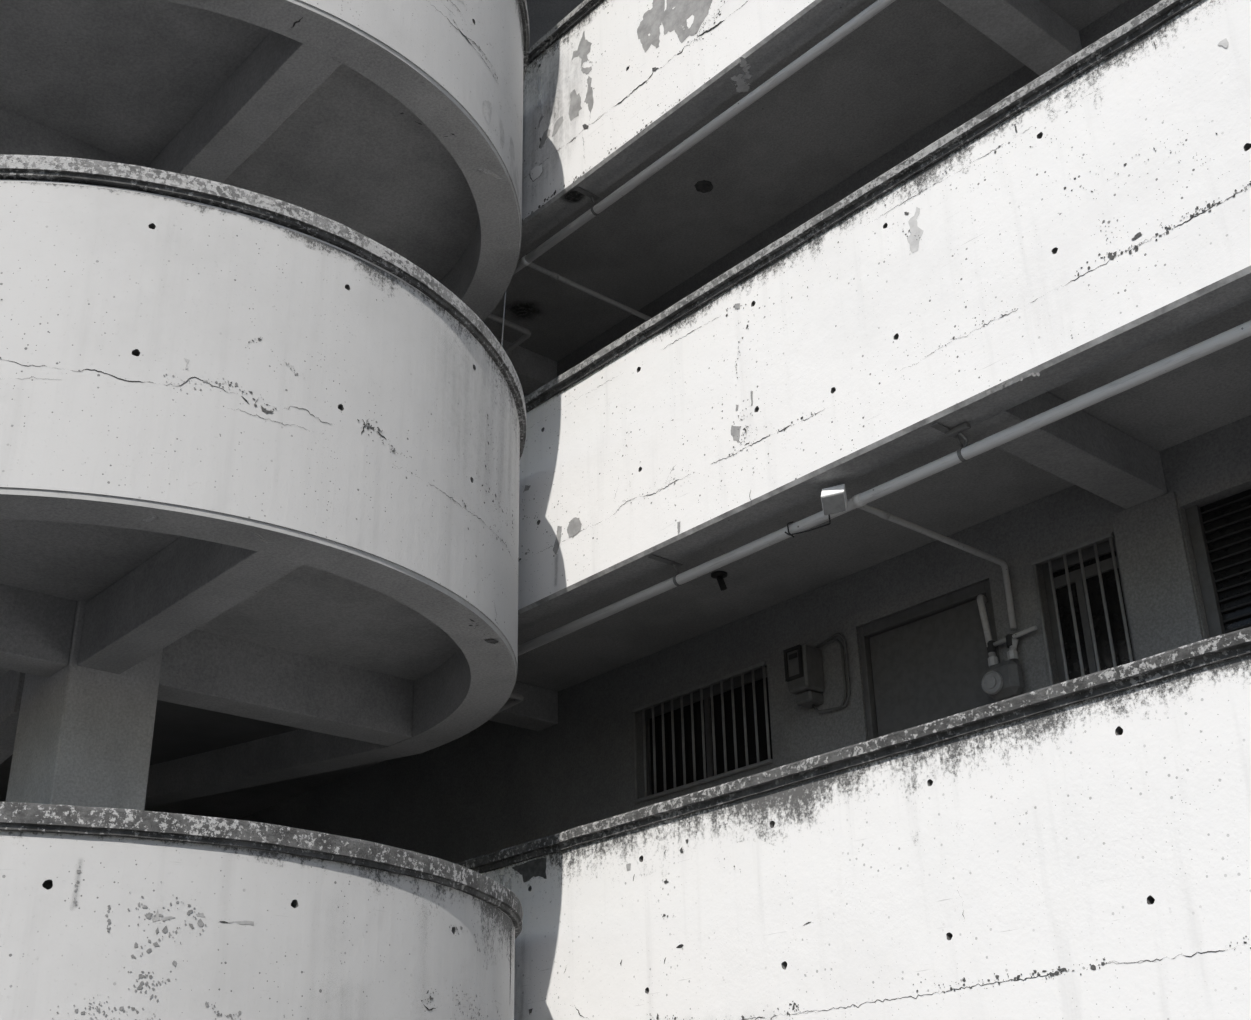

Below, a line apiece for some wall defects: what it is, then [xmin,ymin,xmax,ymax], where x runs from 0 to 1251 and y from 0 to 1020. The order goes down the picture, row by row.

peeling [637,0,712,52]
crack [1063,181,1251,287]
crack [0,357,329,430]
damp [494,654,1251,890]
damp [213,845,324,867]
damp [340,862,515,986]
crack [716,936,1251,1020]